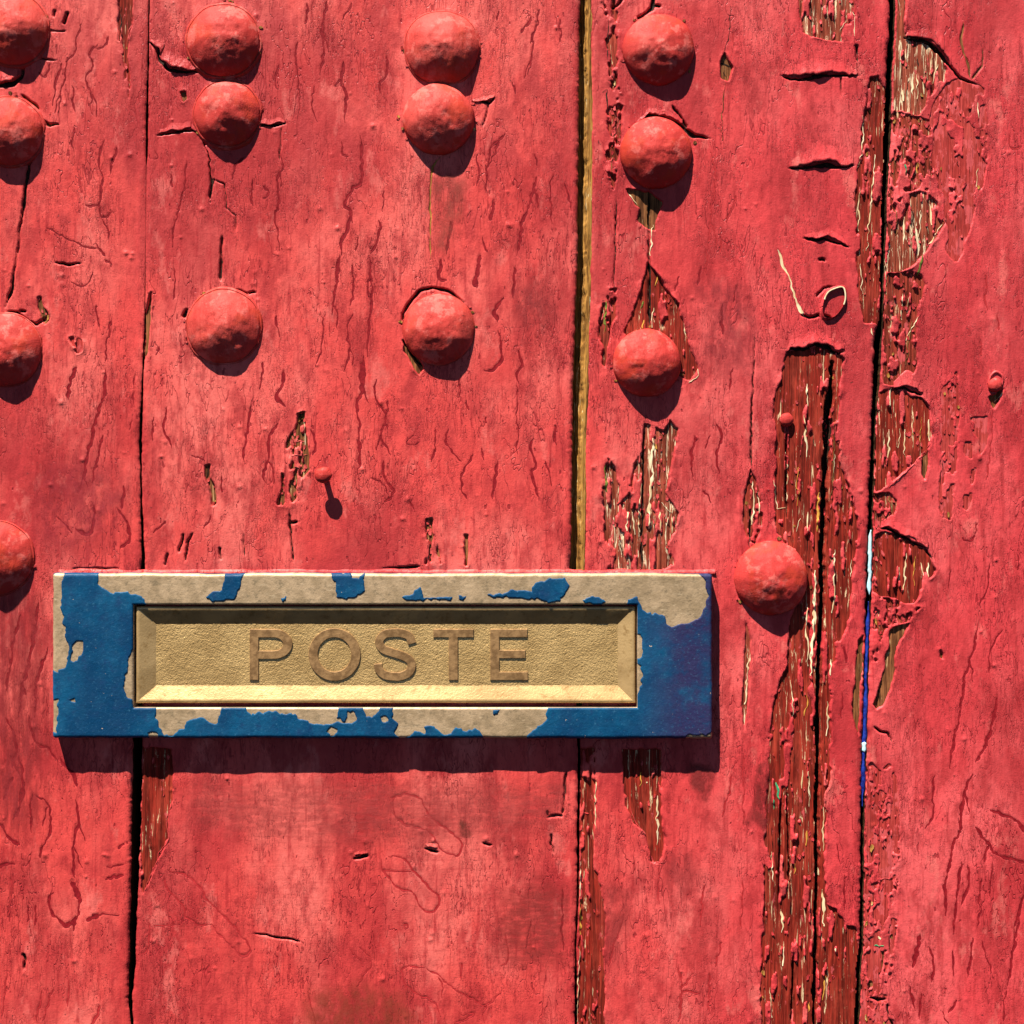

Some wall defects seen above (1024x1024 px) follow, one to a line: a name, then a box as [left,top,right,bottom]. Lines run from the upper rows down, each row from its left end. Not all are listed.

crack [0,10,223,569]
crack [274,0,572,512]
peeling [624,190,699,382]
crack [778,227,848,354]
crack [780,45,859,96]
crack [788,142,855,169]
peeling [819,0,1004,732]
peeling [98,411,709,627]
peeling [742,347,900,1024]
peeling [141,708,221,894]
peeling [622,748,664,864]
crack [870,564,1024,1024]